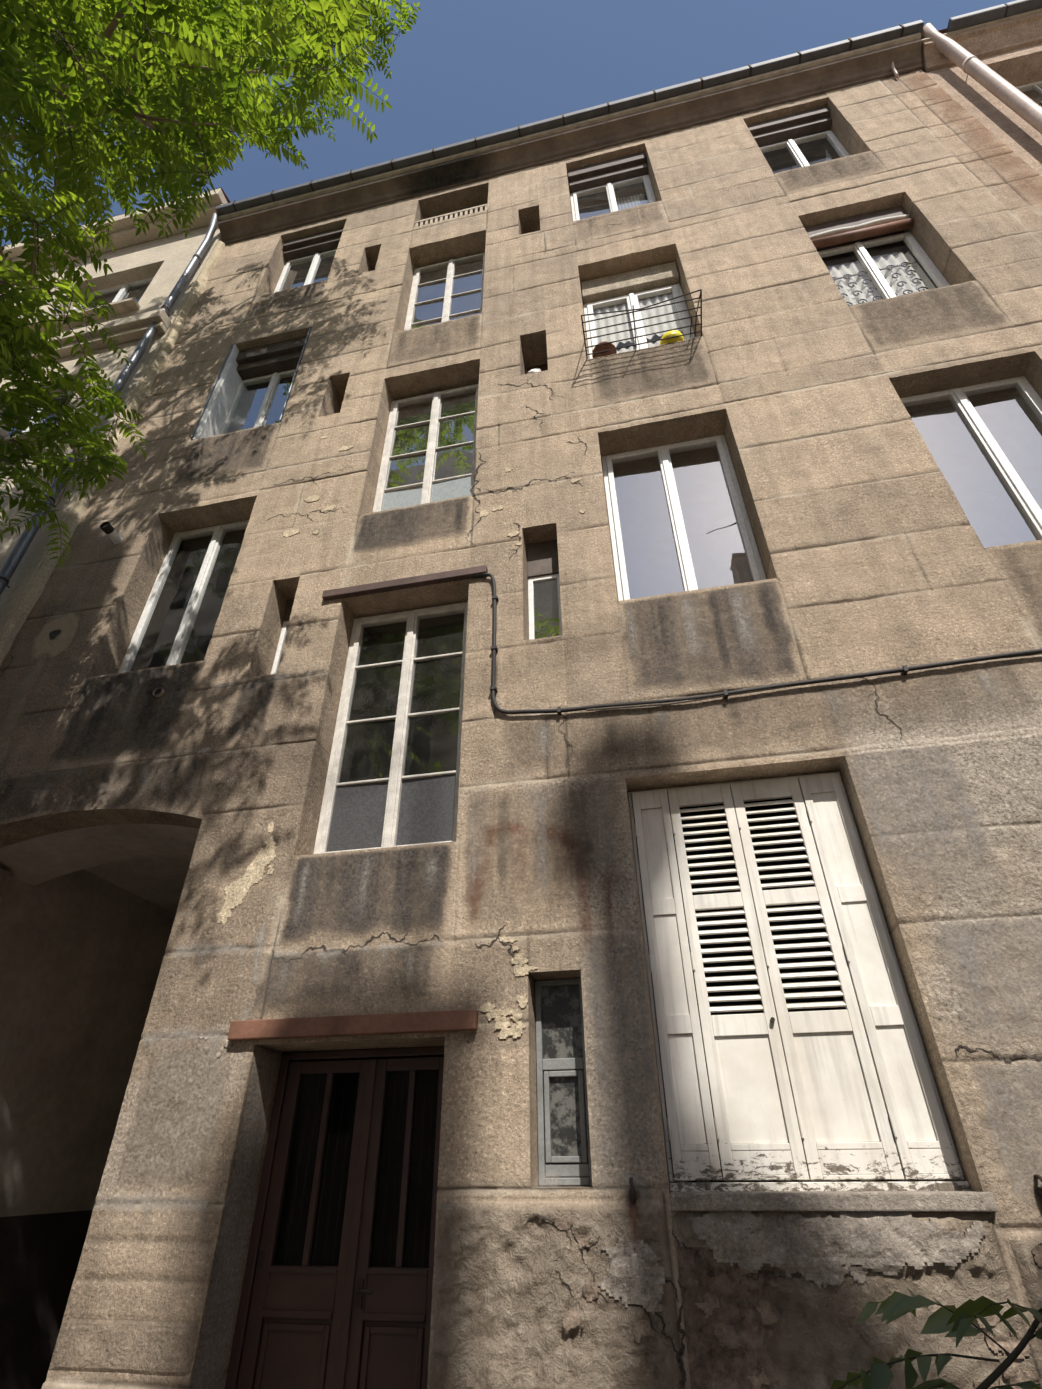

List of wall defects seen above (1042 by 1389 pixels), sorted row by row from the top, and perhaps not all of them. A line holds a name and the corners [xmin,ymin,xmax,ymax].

crack [467,378,588,561]
water stain [627,582,792,683]
water stain [43,663,209,777]
flaking render [217,822,277,925]
water stain [177,846,448,1004]
crack [272,925,515,963]
spalling [480,994,528,1039]
crack [950,1045,1042,1064]
flaking render [553,1215,670,1343]
crack [525,1212,877,1389]
flaking render [688,1211,986,1288]
spalling [963,1315,1042,1389]